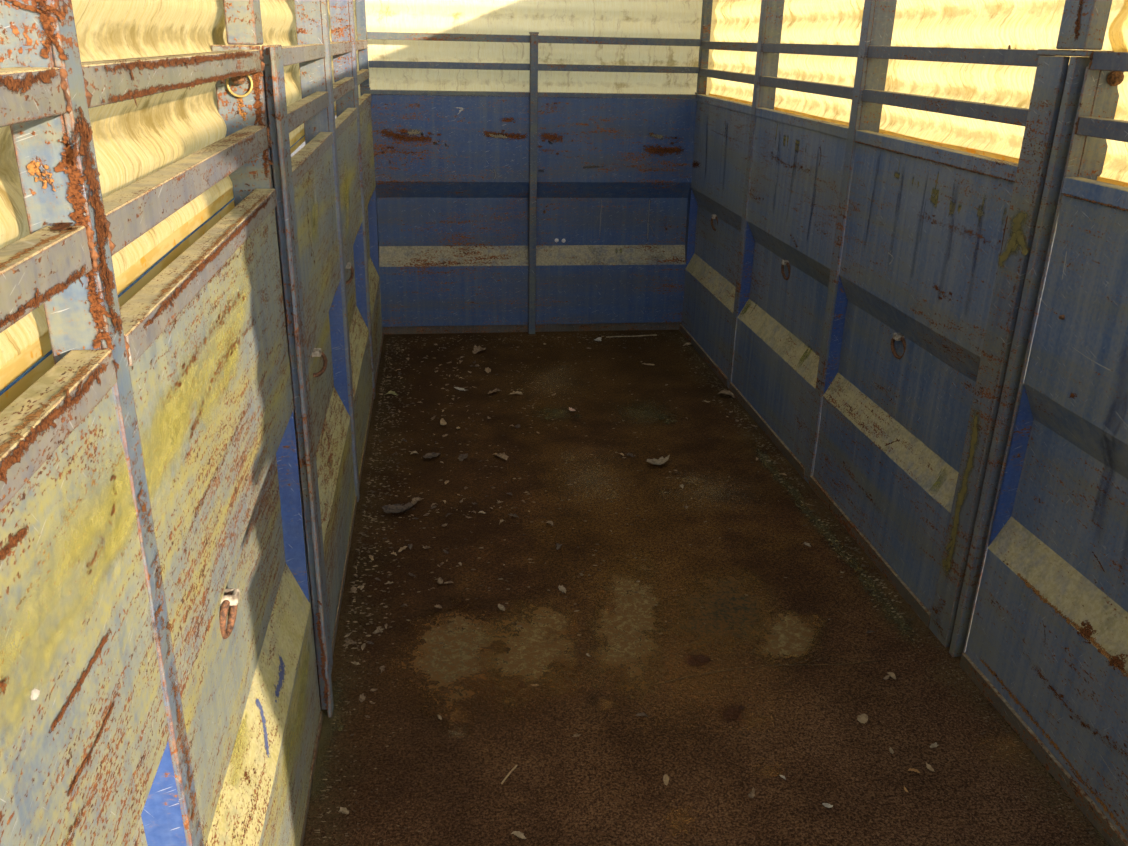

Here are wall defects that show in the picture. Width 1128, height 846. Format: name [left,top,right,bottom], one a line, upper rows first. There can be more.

rust [0,68,58,94]
rust [481,117,564,155]
rust [643,132,684,156]
rust [27,160,62,192]
rust [0,222,79,268]
rust [0,258,93,328]
rust [0,353,133,485]
rust [0,525,29,560]
rust [1003,561,1128,677]
rust [980,651,1128,838]